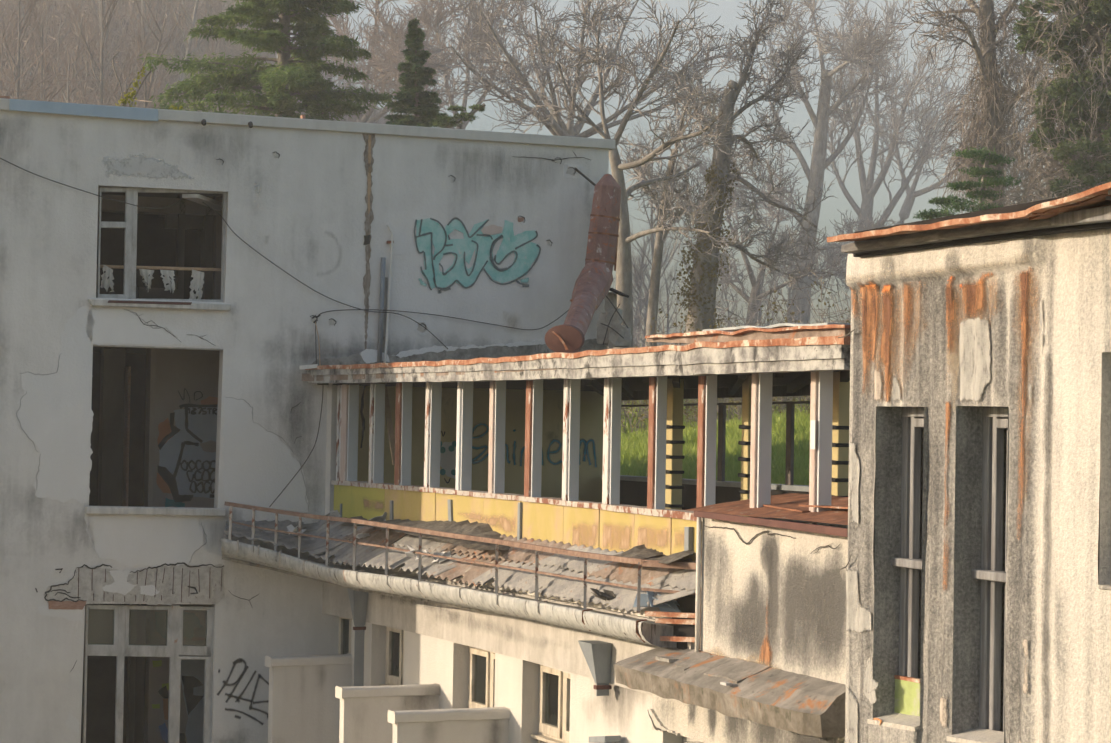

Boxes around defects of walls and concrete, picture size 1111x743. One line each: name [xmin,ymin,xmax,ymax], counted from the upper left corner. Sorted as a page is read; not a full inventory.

rust [827,182,1111,242]
crack [125,309,216,346]
rust [850,281,920,401]
rust [945,273,996,349]
peeling [959,317,990,402]
rust [1017,268,1036,516]
peeling [16,305,225,624]
crack [704,525,852,570]